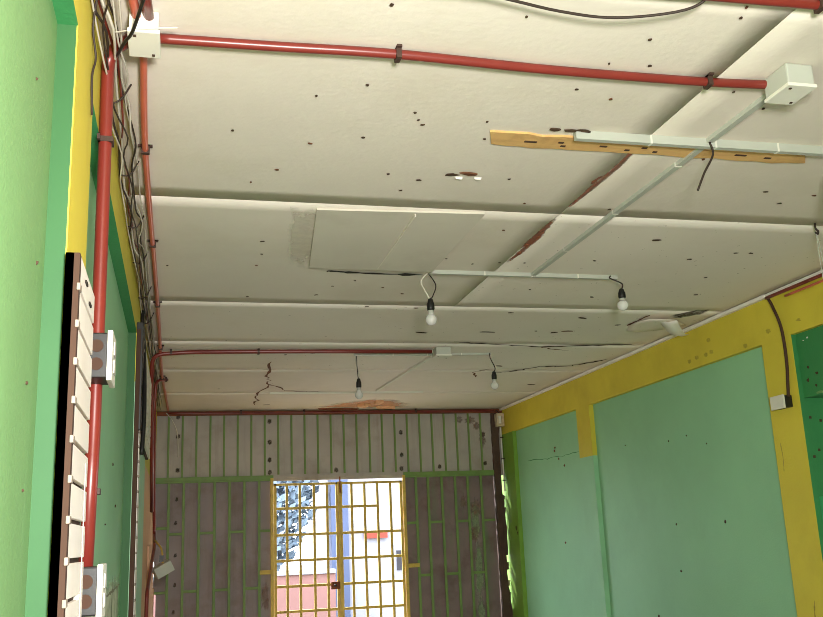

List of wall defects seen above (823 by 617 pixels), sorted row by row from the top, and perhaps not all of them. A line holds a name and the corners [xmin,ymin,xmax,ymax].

crack [253,362,307,405]